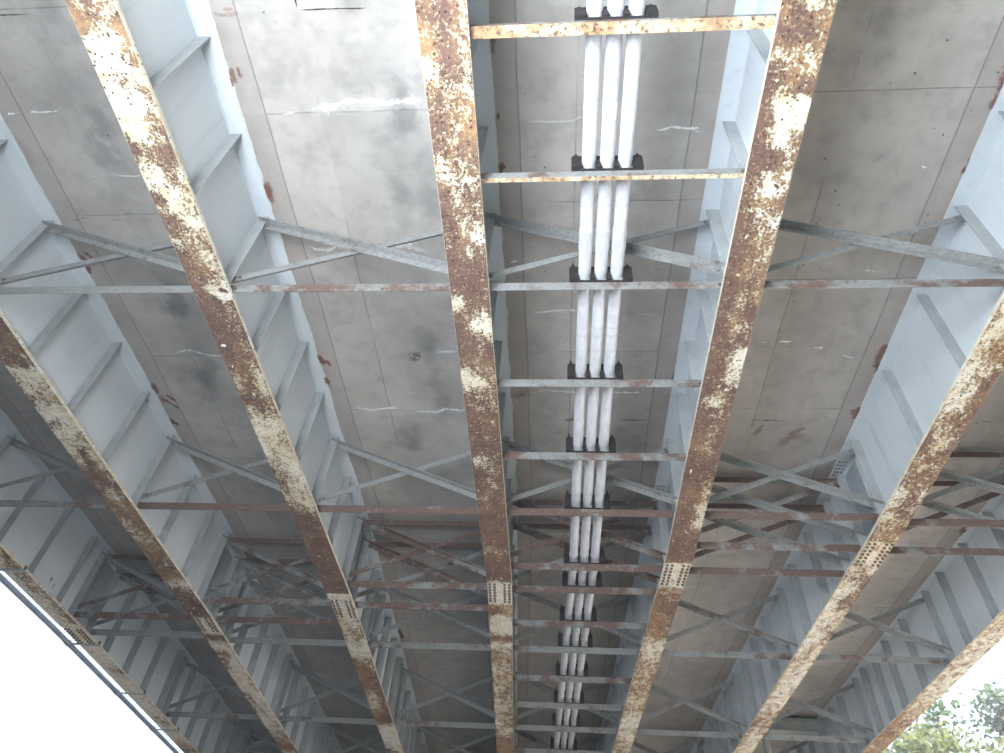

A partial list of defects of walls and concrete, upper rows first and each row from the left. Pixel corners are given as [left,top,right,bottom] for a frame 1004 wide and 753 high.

corrosion [0,317,298,753]
corrosion [65,0,349,594]
crack [294,0,361,10]
crack [283,97,421,115]
corrosion [336,609,403,753]
corrosion [414,0,513,753]
corrosion [612,0,836,753]
corrosion [734,300,1004,753]